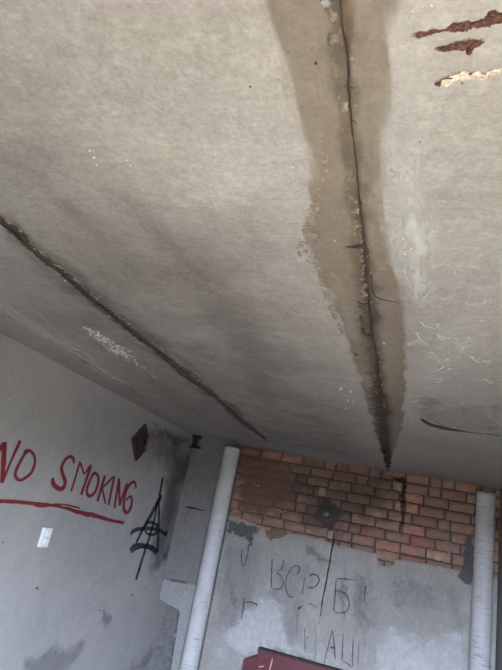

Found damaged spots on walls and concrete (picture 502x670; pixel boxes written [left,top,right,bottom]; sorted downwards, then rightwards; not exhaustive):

corrosion [415,10,502,39]
corrosion [438,40,484,55]
spalling [434,68,502,87]
leakage [271,0,405,468]
crack [339,0,401,471]
leakage [397,197,436,302]
crack [0,214,267,441]